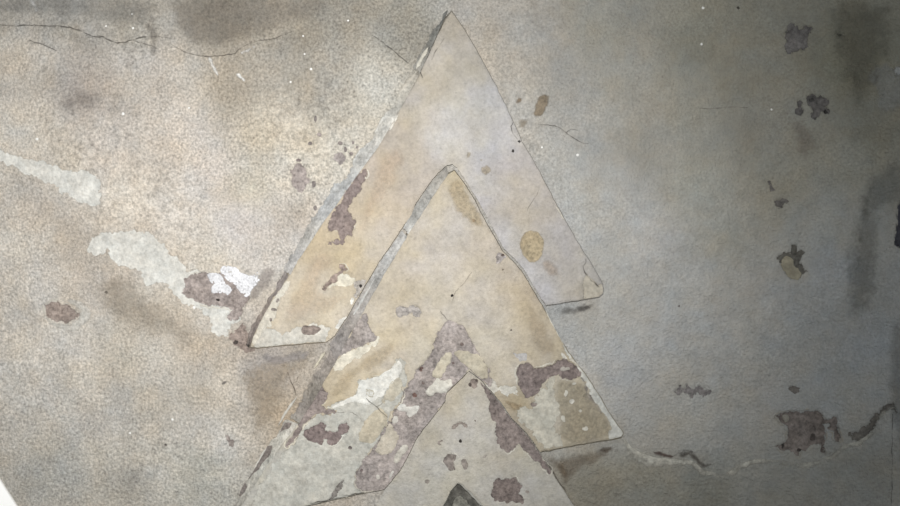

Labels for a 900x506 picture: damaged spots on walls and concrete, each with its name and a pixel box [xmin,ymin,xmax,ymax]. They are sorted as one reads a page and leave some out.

spalling [784,23,813,54]
spalling [795,94,830,120]
spalling [290,158,316,193]
spalling [328,169,370,245]
spalling [777,245,807,280]
peeling [87,230,347,353]
spalling [42,298,80,326]
peeling [251,313,897,506]